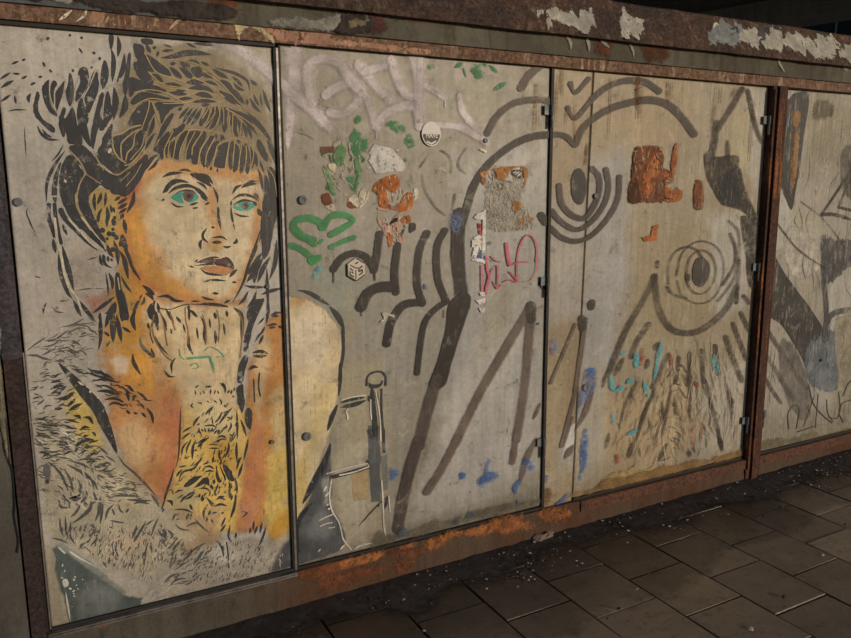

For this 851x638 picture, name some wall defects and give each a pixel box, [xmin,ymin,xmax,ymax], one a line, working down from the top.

spalling [54,0,431,55]
peeling [537,6,596,34]
peeling [619,7,645,40]
peeling [708,18,851,63]
leakage [572,450,744,496]
corrosion [300,514,525,590]